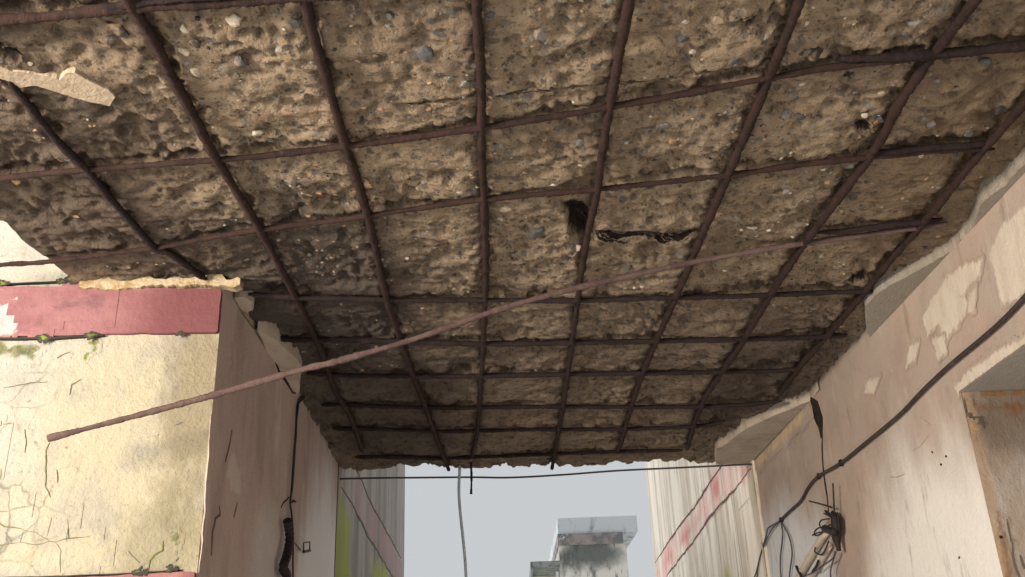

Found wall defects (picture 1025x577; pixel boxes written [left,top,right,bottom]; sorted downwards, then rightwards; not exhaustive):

rust [199,98,333,127]
crack [581,211,697,246]
peeling [0,293,20,337]
spalling [47,58,981,494]
peeling [904,199,1025,371]
peeling [953,332,1025,400]
rust [965,390,1025,423]
crack [0,421,89,570]
peeling [198,414,211,573]
crack [128,542,179,567]